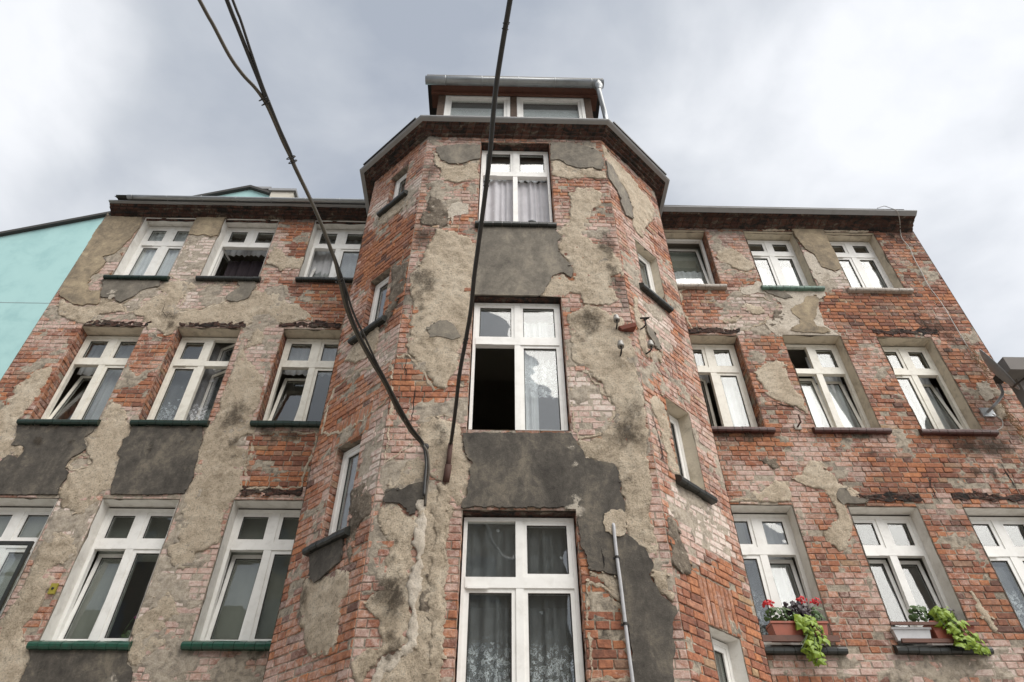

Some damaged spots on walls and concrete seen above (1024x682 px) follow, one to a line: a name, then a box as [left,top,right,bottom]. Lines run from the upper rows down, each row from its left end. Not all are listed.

flaking render [716,229,868,337]
flaking render [0,142,693,682]
flaking render [754,358,808,414]
flaking render [730,457,867,552]